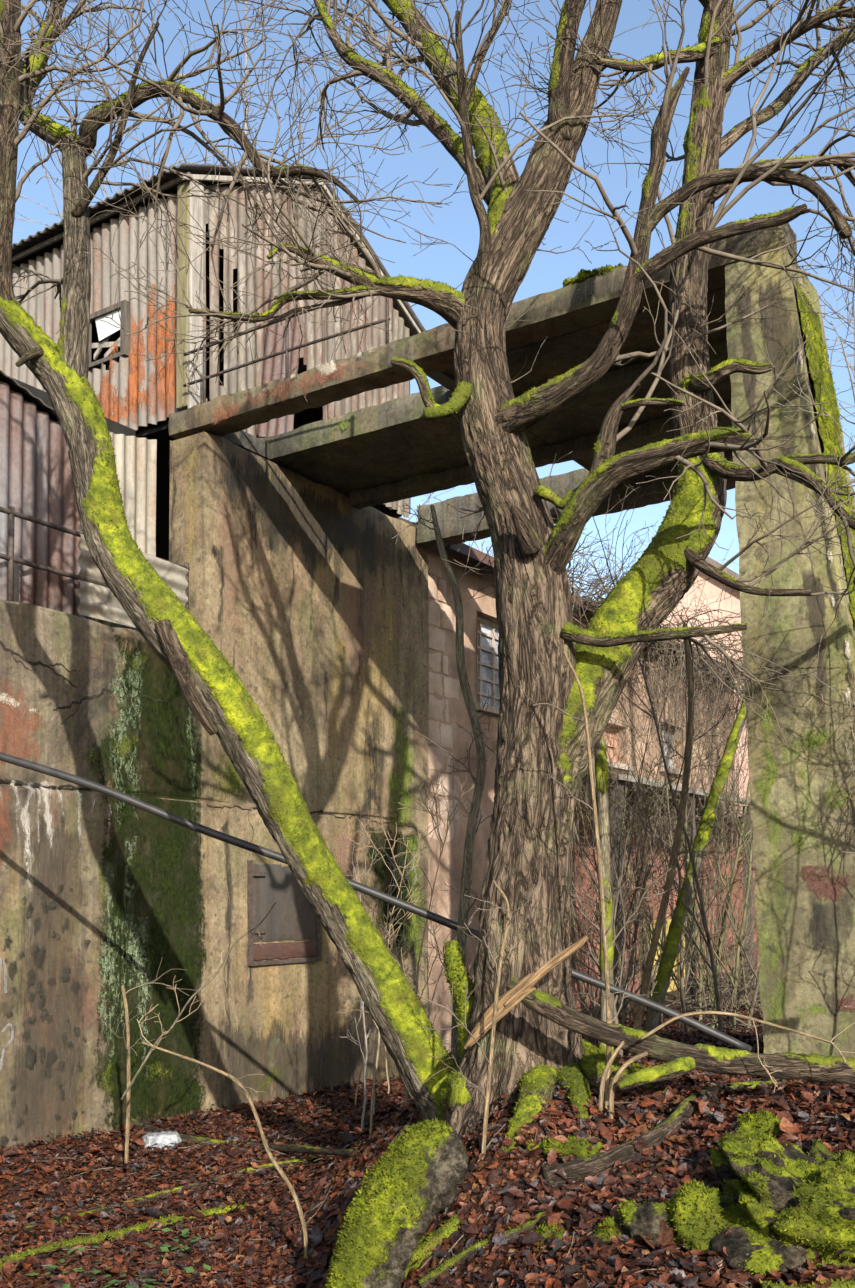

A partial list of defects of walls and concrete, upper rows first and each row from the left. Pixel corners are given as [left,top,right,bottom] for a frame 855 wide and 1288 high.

corrosion [96,281,177,426]
damp [212,545,224,622]
damp [214,454,426,641]
damp [738,277,855,733]
crack [0,641,188,724]
damp [11,780,61,887]
damp [77,634,399,1130]
damp [801,865,853,952]